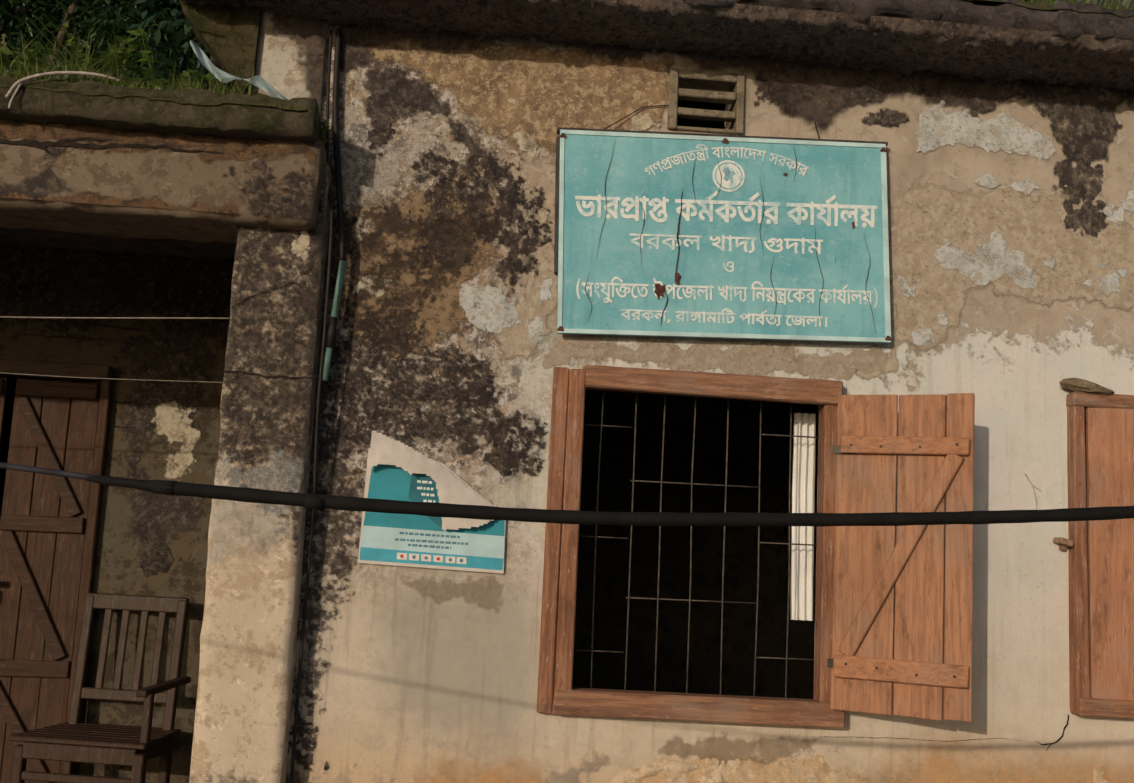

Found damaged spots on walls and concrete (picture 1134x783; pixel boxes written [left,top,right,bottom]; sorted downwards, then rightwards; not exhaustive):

crack [0,137,222,156]
spalling [179,0,1134,380]
water stain [546,41,1134,237]
peeling [151,401,201,479]
water stain [0,12,553,783]
crack [860,715,1069,750]